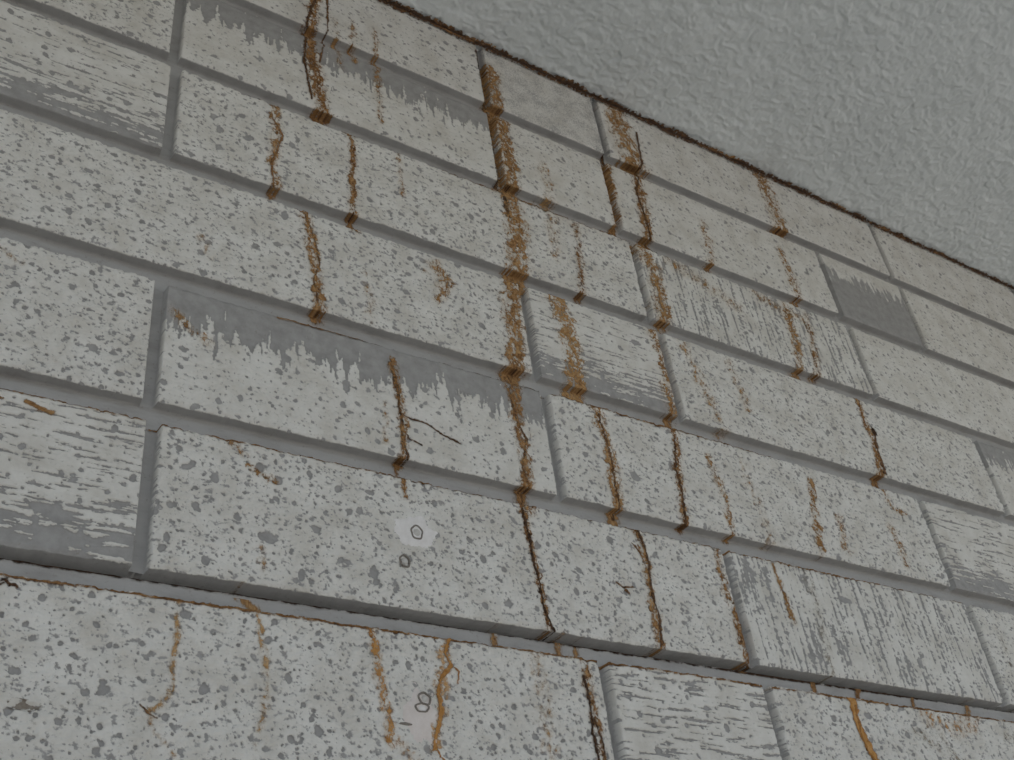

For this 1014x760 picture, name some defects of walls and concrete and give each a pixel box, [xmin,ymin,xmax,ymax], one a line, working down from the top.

corrosion [300,0,384,126]
corrosion [0,50,762,760]
crack [378,0,1014,289]
corrosion [752,172,821,383]
corrosion [854,398,907,516]
corrosion [686,454,1014,760]